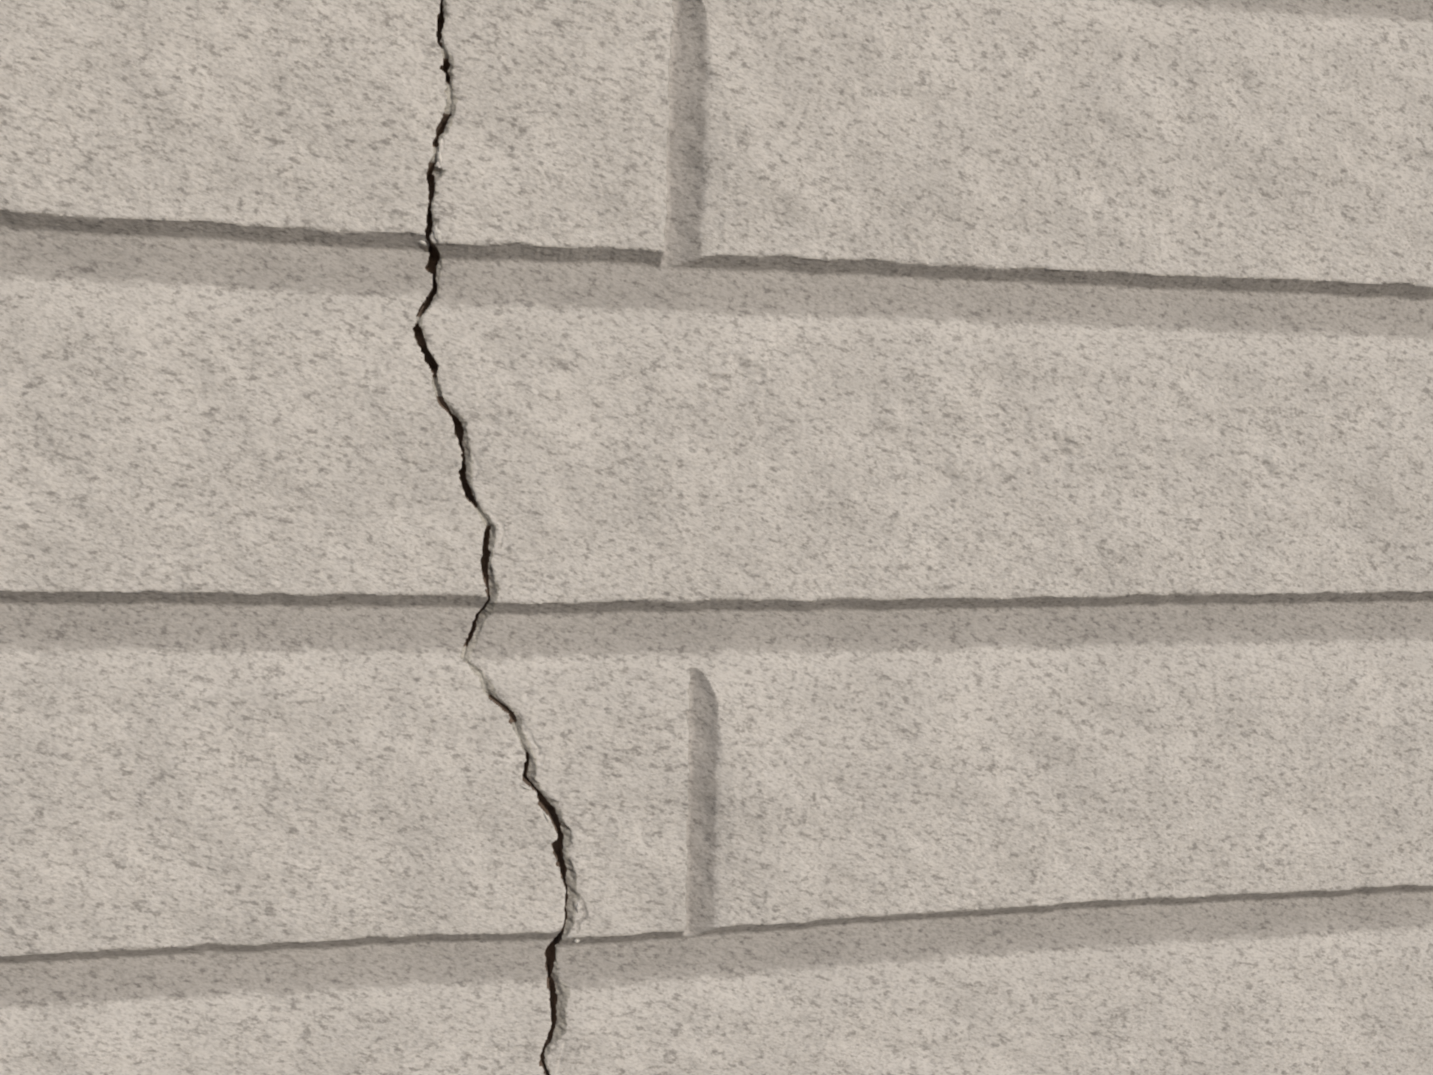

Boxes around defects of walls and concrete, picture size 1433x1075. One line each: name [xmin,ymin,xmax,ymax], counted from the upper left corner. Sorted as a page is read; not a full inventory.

crack [413,0,598,1075]